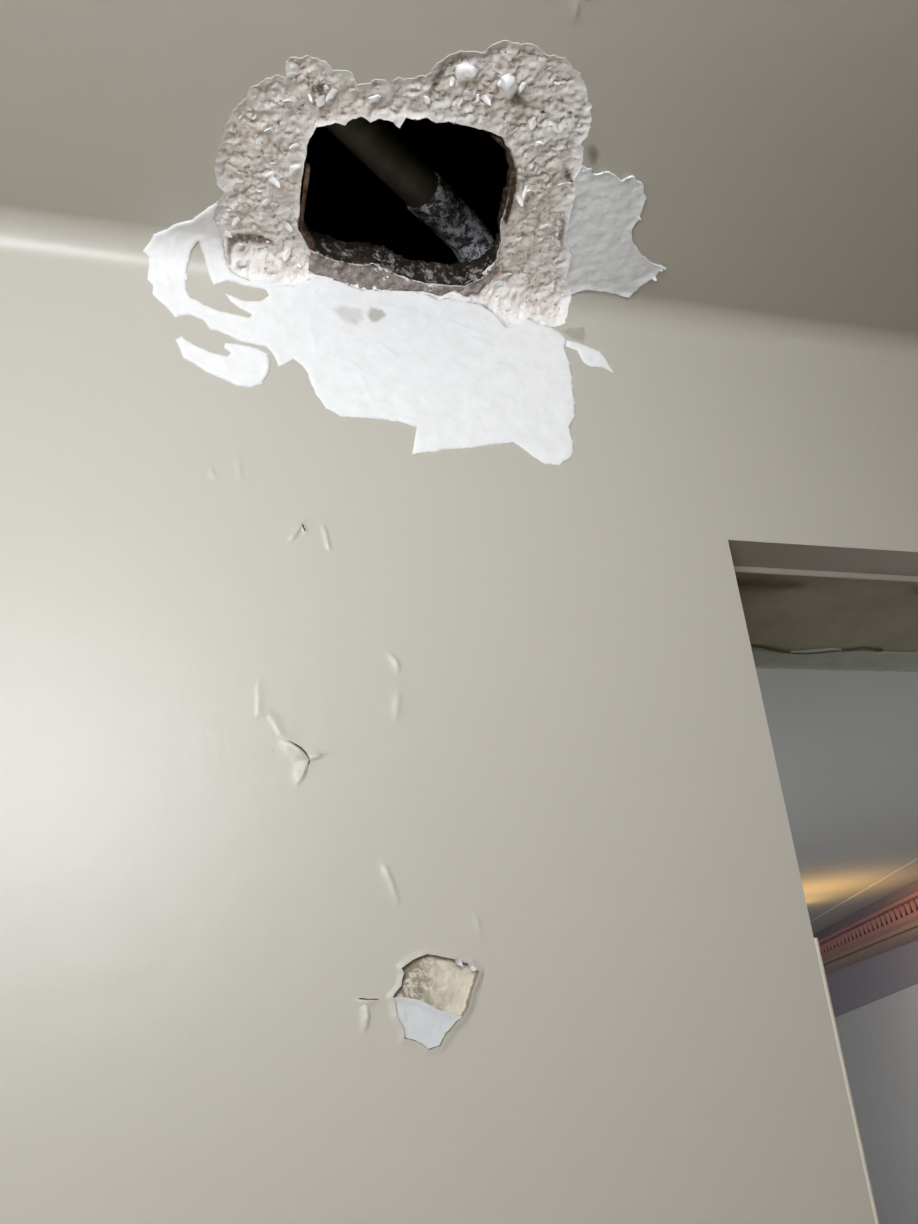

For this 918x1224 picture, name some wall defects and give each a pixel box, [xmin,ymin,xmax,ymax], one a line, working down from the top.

flaking render [143,40,666,466]
flaking render [381,943,485,1061]